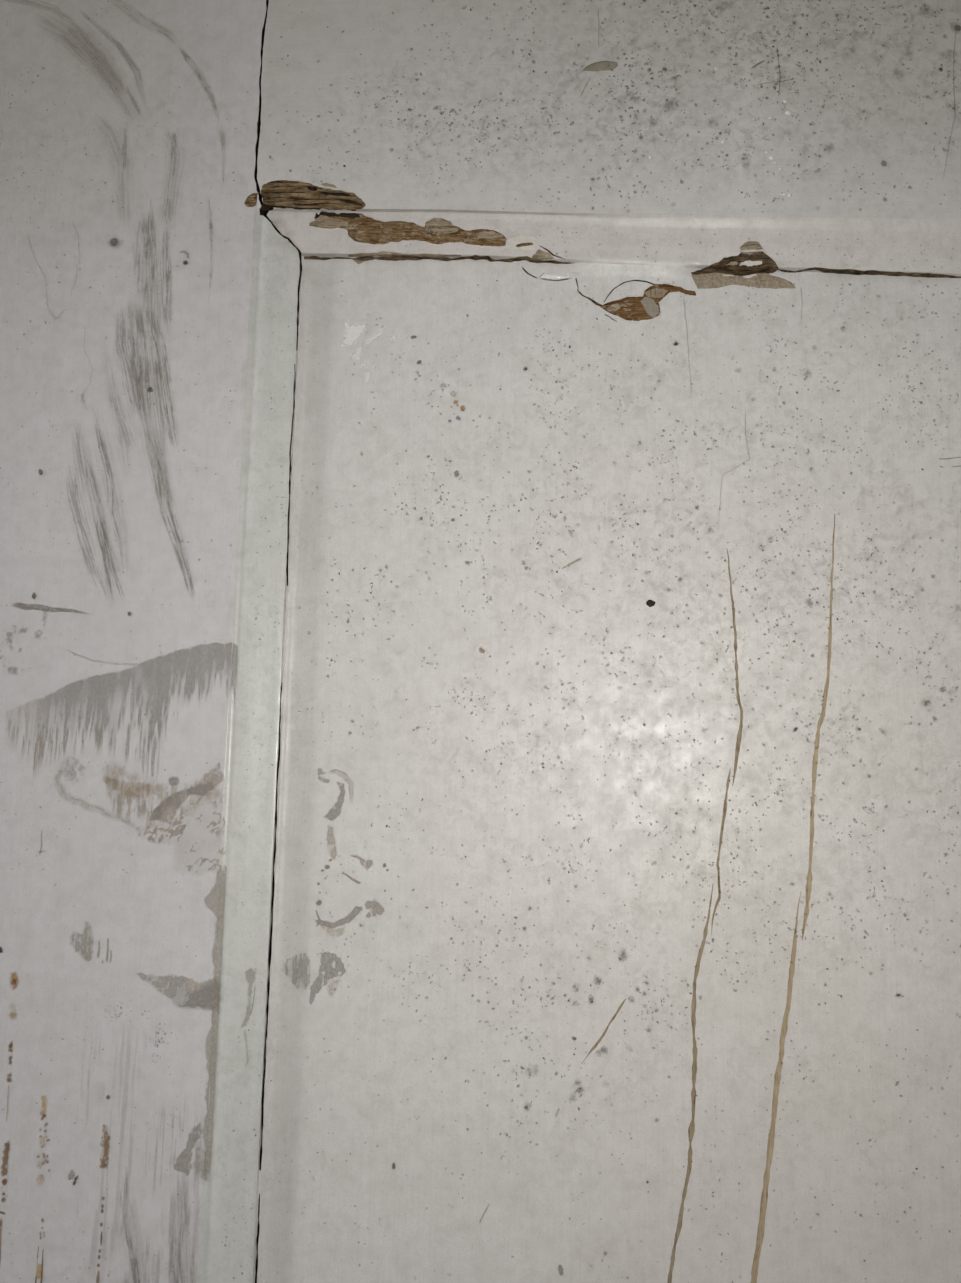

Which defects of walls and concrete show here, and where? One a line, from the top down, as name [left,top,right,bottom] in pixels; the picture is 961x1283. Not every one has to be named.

spalling [244,178,554,260]
crack [254,0,571,586]
spalling [575,241,795,322]
crack [775,267,961,278]
water stain [105,770,223,873]
crack [667,549,743,1283]
crack [751,514,835,1283]
corrosion [0,1143,9,1235]
corrosion [37,1096,50,1184]
corrosion [101,1126,110,1168]
corrosion [35,1219,43,1283]